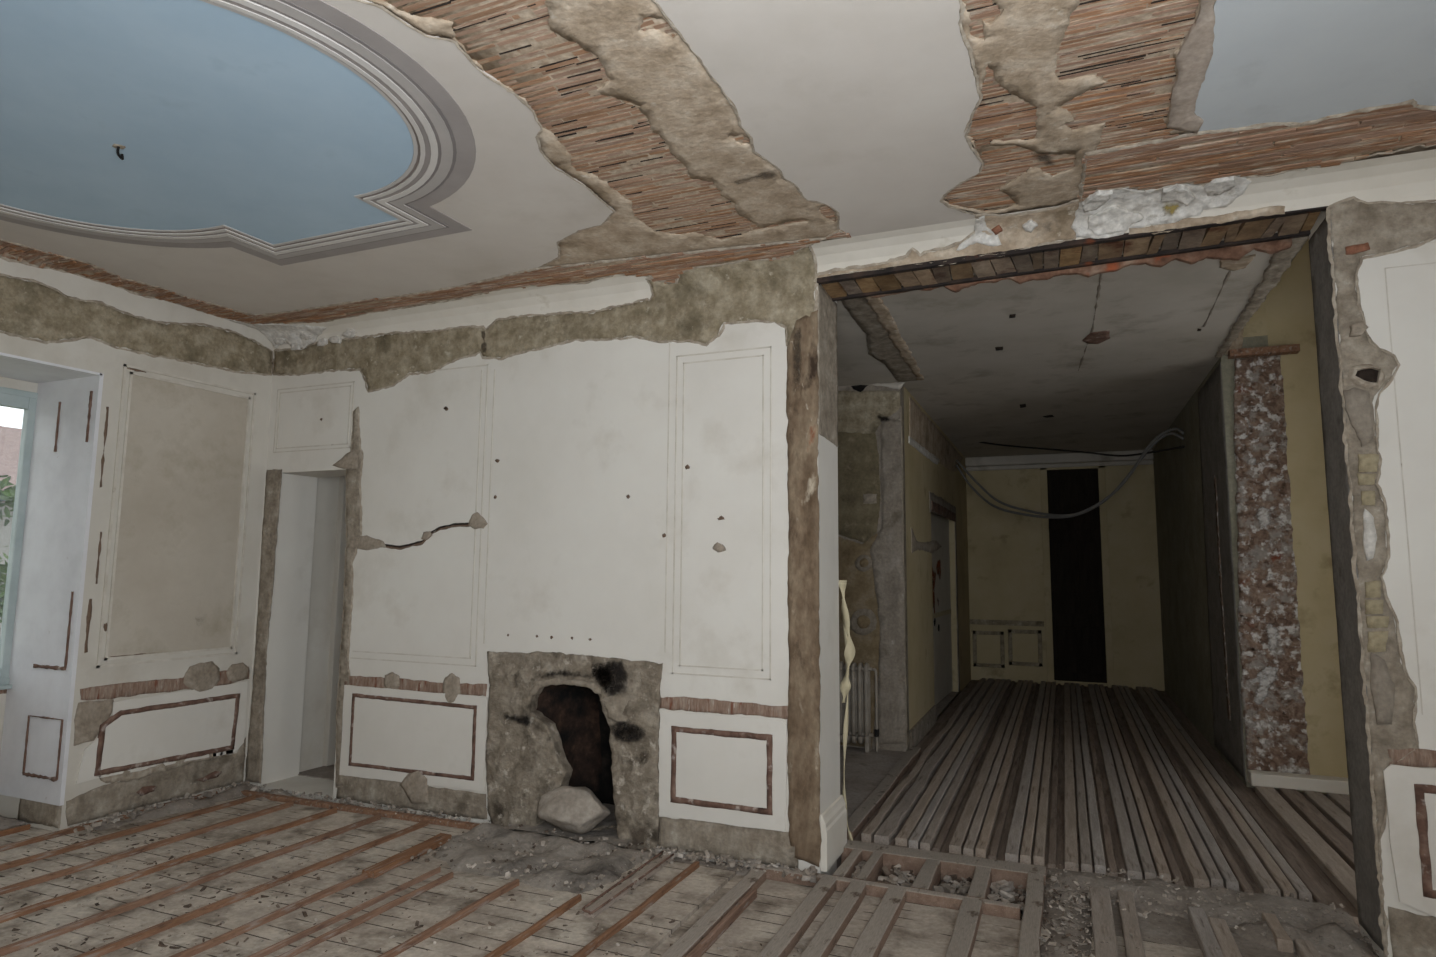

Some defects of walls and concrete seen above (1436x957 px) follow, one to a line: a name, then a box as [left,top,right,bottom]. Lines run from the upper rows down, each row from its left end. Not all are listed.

spalling [940,0,1436,239]
crack [347,512,488,550]
spalling [0,0,1080,869]
flaking render [1198,236,1349,795]
spalling [1326,196,1436,957]